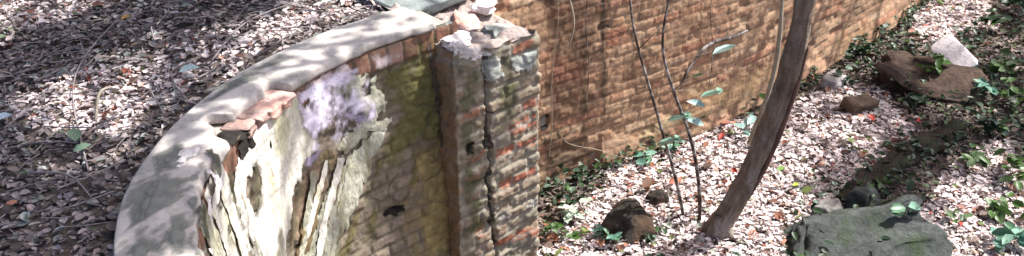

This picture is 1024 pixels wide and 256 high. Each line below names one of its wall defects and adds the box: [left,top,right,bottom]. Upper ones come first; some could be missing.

peeling [453,42,537,82]
peeling [165,73,394,256]
crack [471,56,507,256]